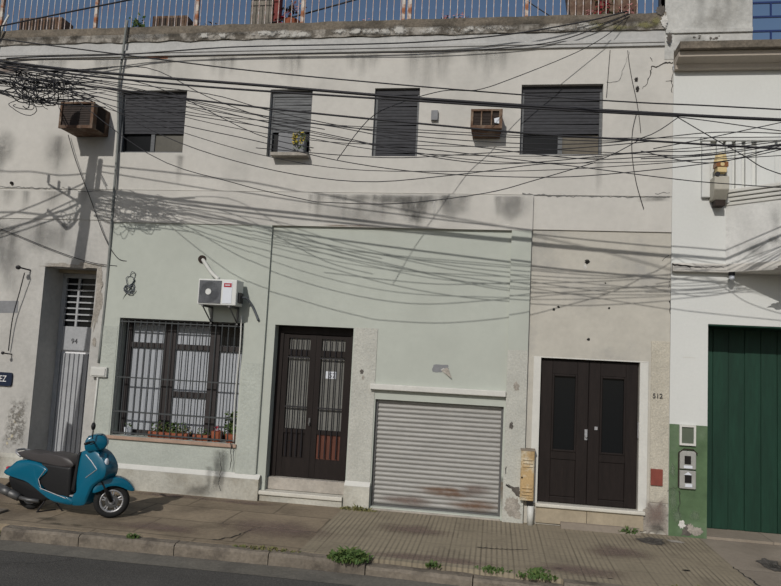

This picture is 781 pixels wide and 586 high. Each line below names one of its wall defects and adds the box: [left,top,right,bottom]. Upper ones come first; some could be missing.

crack [608,53,673,92]
crack [662,255,724,312]
flaking render [504,484,521,519]
flaking render [635,492,703,545]